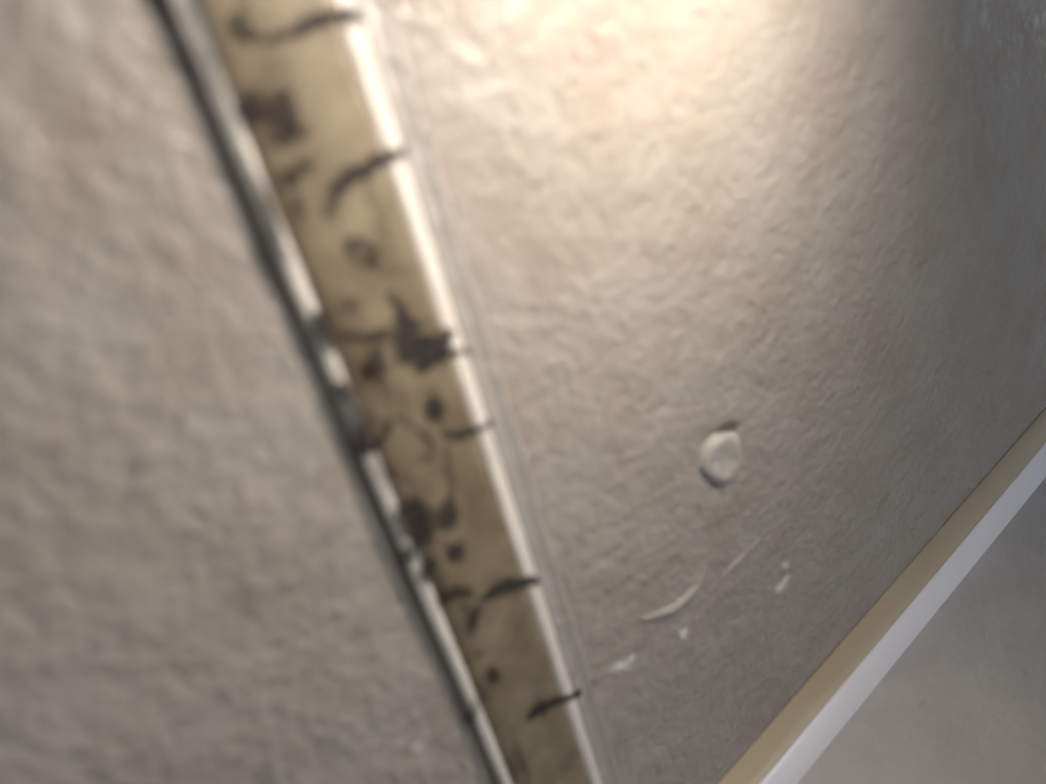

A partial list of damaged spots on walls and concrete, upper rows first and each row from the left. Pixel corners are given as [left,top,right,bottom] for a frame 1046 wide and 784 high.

water stain [229,7,367,44]
water stain [251,161,309,257]
water stain [328,146,409,213]
water stain [340,293,482,384]
water stain [396,397,540,634]
water stain [527,680,595,720]